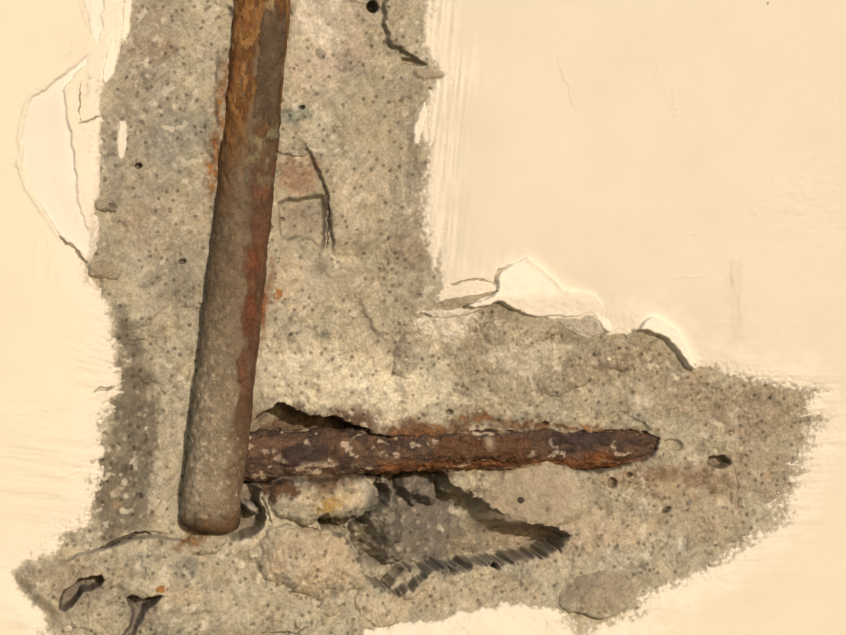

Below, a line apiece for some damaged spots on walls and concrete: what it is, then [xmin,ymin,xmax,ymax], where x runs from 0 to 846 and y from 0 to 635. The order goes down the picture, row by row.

rust [205,0,291,194]
spalling [14,0,402,635]
rust [235,156,282,419]
spalling [250,0,822,624]
rust [261,479,301,503]
rust [379,453,619,474]
rust [391,412,610,436]
spalling [568,612,618,635]